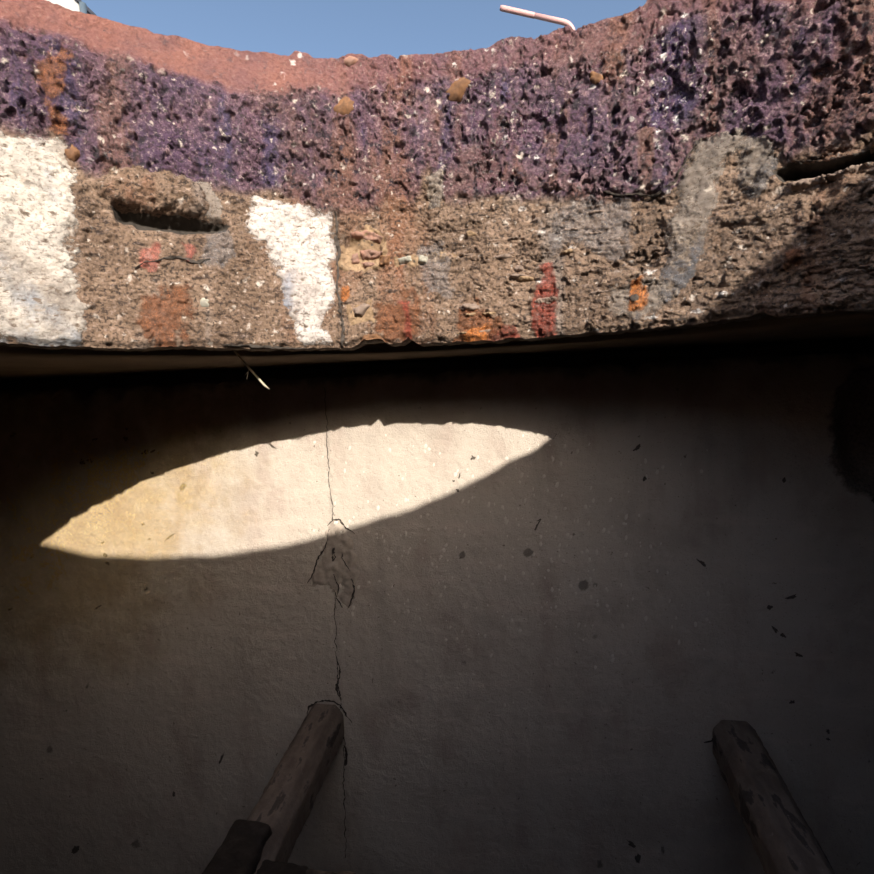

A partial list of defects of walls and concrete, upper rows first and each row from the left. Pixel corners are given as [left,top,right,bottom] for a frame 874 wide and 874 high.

spalling [111,181,230,235]
crack [324,388,336,562]
crack [307,589,352,858]